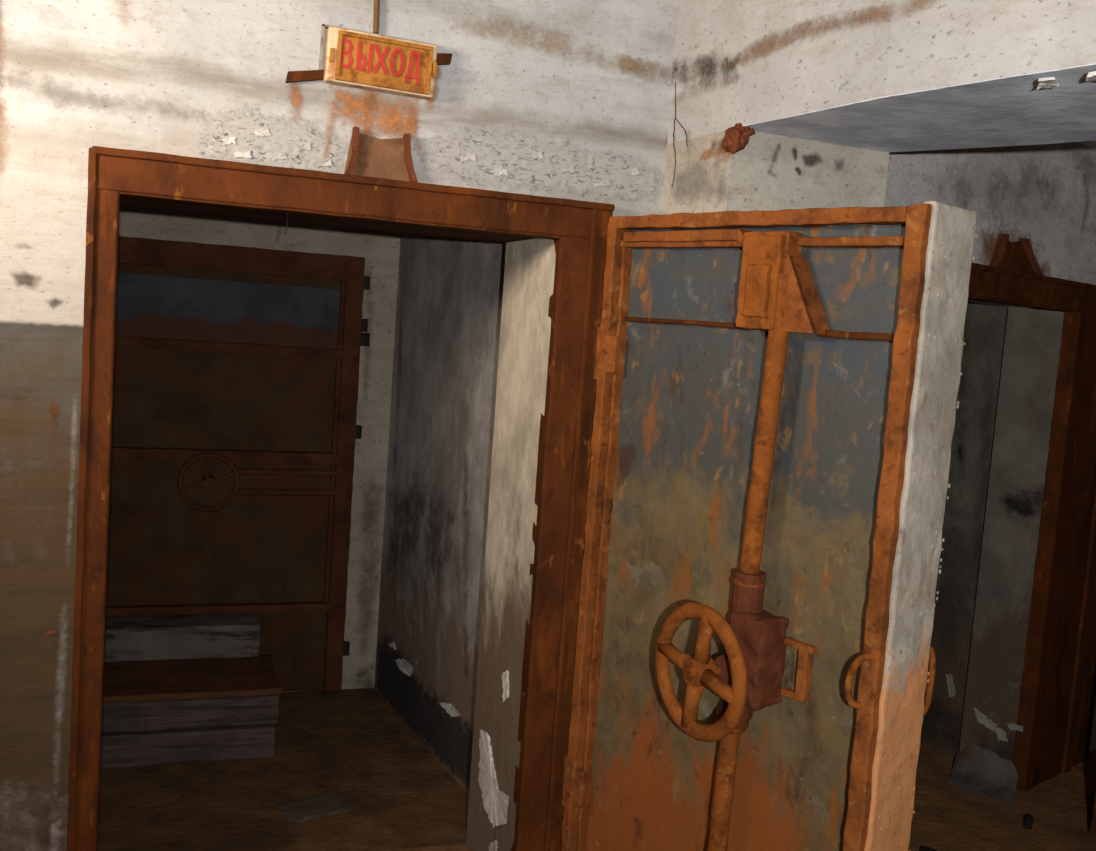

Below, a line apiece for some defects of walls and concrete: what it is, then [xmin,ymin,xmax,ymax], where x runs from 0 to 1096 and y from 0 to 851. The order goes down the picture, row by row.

rust [291,86,301,108]
rust [338,90,417,137]
damp [620,59,651,73]
damp [673,8,888,82]
spalling [1037,77,1059,90]
flaking render [375,637,509,851]
peeling [922,674,957,743]
peeling [974,707,1024,761]